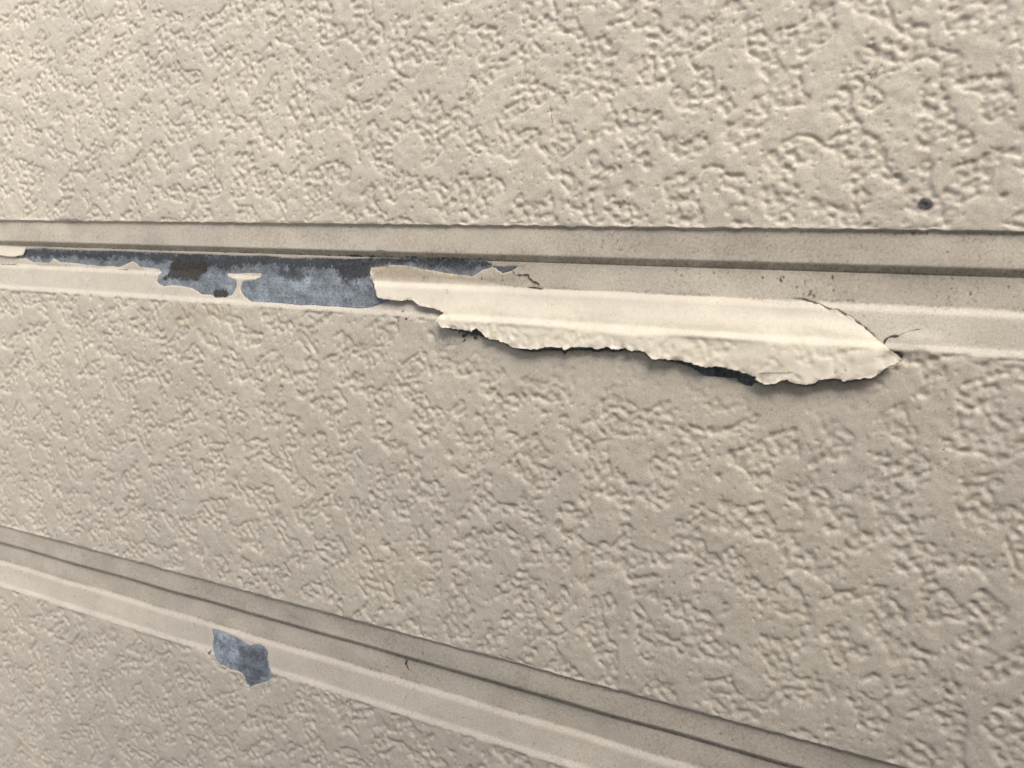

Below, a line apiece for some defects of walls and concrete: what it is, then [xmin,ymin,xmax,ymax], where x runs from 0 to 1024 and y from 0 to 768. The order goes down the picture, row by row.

peeling [0,246,903,386]
peeling [208,629,274,686]